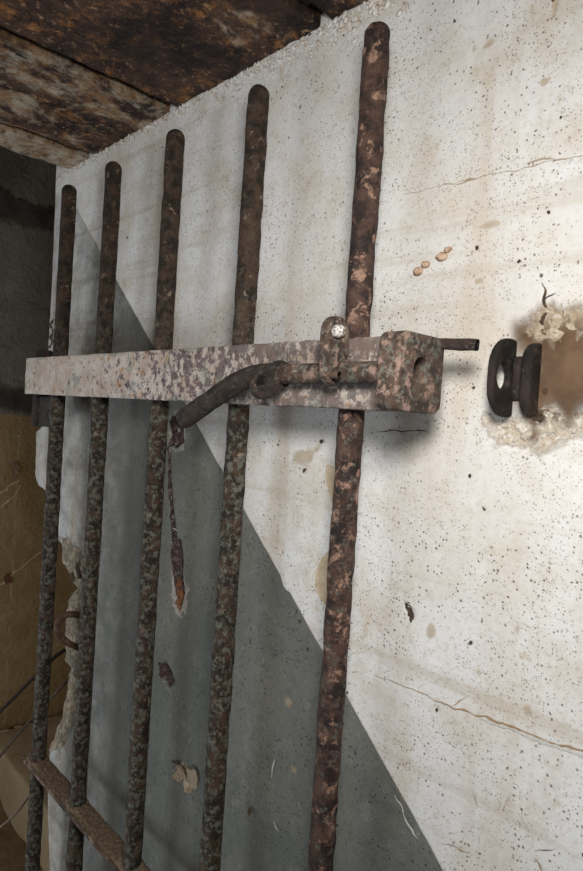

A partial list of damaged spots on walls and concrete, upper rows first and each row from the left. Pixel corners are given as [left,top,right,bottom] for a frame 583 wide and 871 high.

peeling [56,0,409,182]
crack [402,155,583,195]
spalling [526,304,583,342]
spalling [481,405,583,455]
spalling [49,537,84,753]
crack [375,675,583,757]
spalling [171,759,199,793]